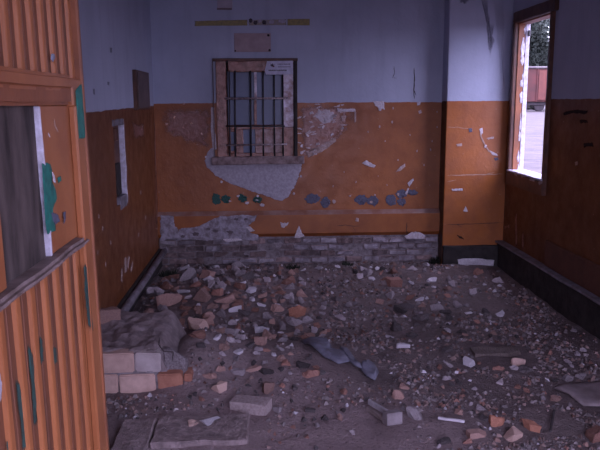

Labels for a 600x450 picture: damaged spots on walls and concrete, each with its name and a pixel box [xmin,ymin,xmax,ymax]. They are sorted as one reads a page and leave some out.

peeling [166,103,302,207]
peeling [297,103,356,158]
peeling [468,128,499,161]
flaking render [143,215,438,339]